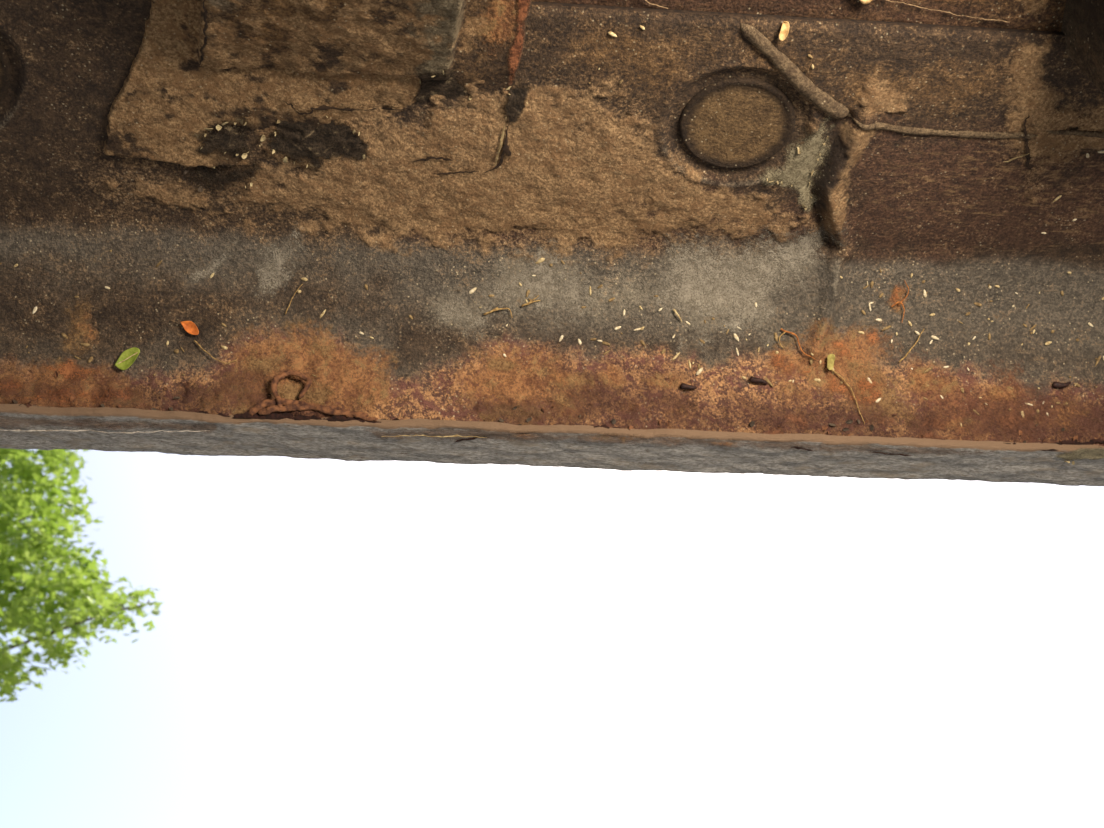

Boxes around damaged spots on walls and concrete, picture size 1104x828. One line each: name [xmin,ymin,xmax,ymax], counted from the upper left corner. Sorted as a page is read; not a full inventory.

crack [199,0,208,67]
rust [484,0,530,81]
crack [410,124,511,175]
crack [1003,115,1032,171]
damp [254,228,303,296]
damp [438,239,594,340]
damp [651,227,842,346]
rust [0,304,156,410]
rust [460,352,621,436]
rust [772,322,1093,444]